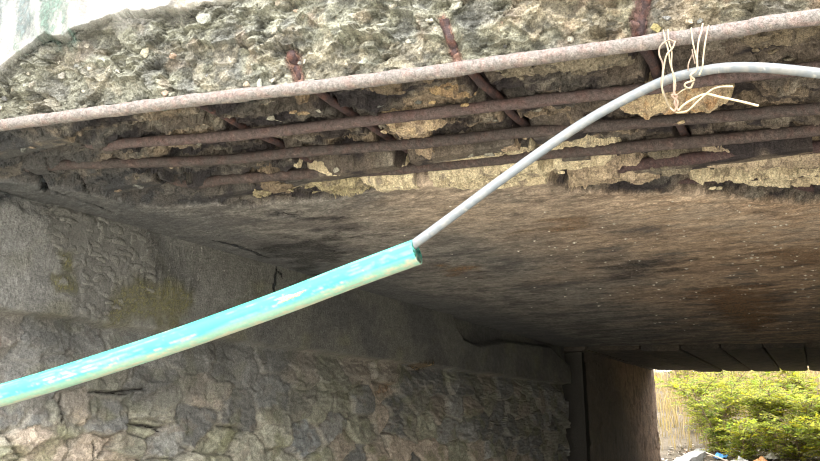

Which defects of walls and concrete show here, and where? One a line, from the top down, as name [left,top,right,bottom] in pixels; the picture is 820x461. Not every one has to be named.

spalling [0,0,636,119]
spalling [0,25,820,207]
spalling [646,0,820,35]
crack [212,240,283,292]